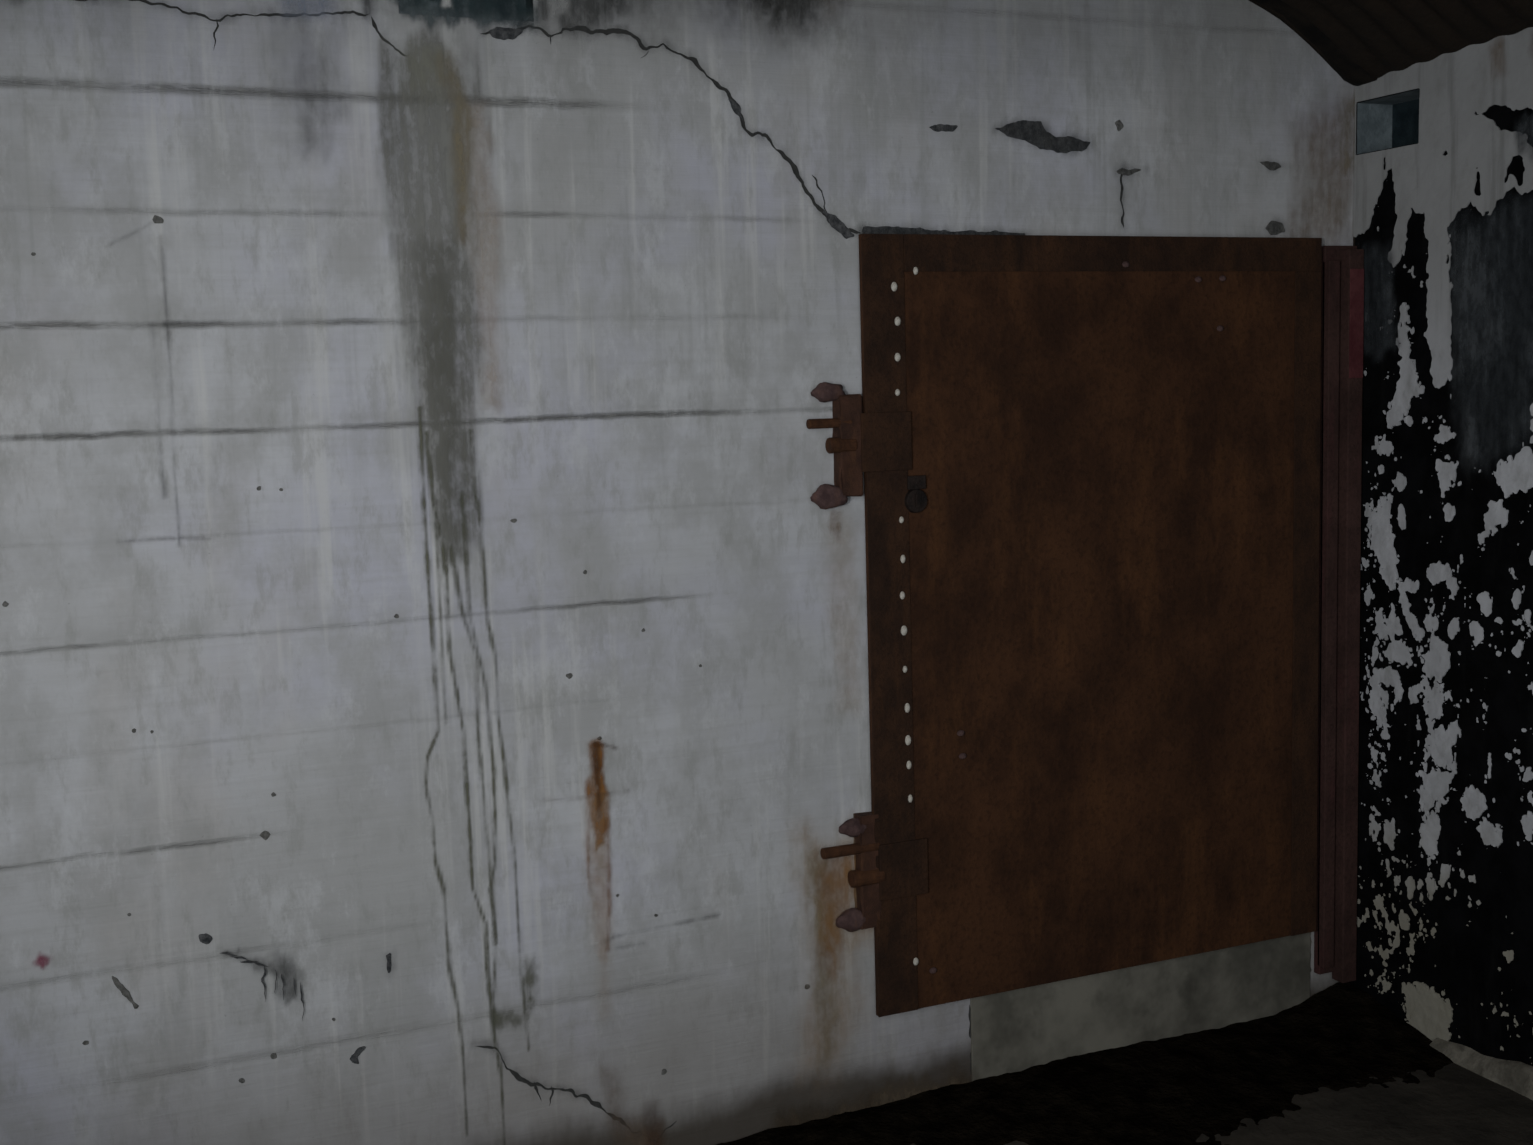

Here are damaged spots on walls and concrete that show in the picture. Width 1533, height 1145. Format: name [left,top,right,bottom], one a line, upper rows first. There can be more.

crack [129,0,406,56]
water stain [541,0,625,25]
crack [480,25,861,239]
spalling [929,124,958,132]
spalling [995,120,1090,153]
water stain [381,35,533,1105]
peeling [1352,27,1533,1041]
corrosion [586,741,608,848]
peeling [1481,992,1533,1051]
crack [476,1046,675,1144]